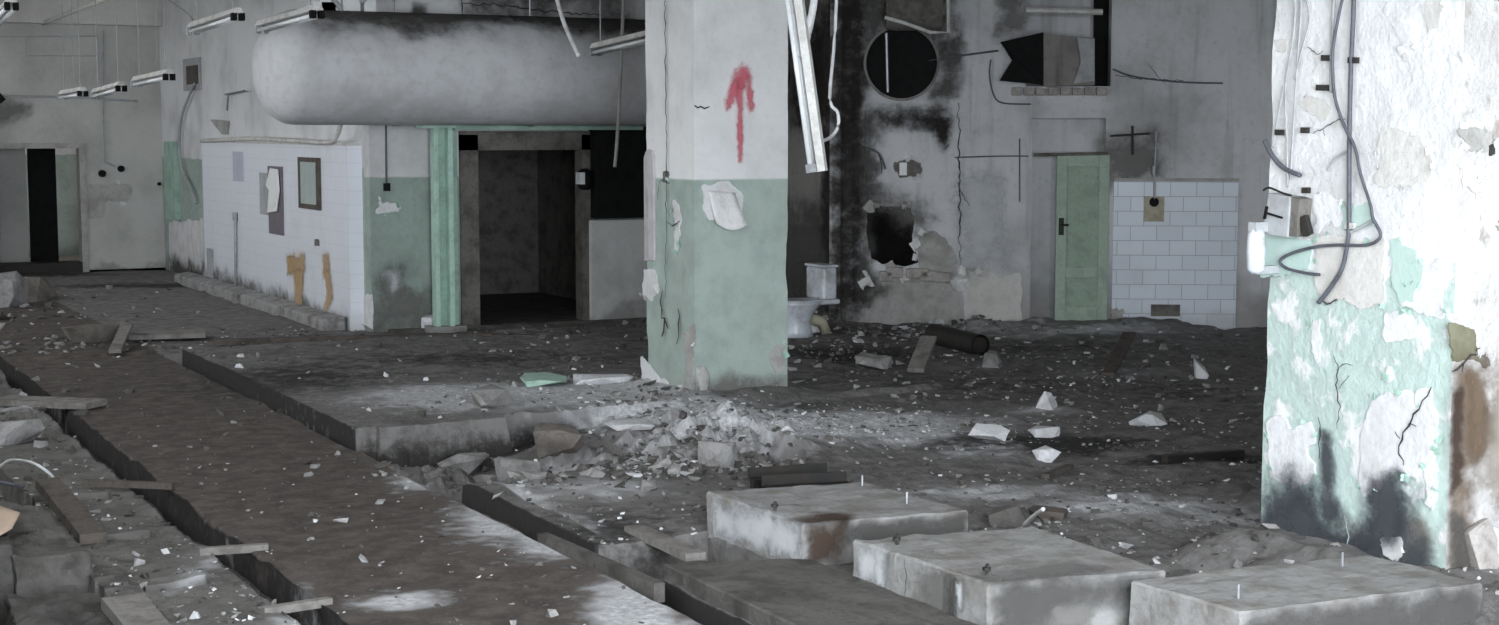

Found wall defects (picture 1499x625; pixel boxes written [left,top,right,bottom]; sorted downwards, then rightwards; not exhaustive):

water stain [820,0,863,294]
spalling [893,153,923,183]
water stain [936,119,947,148]
spalling [857,199,1023,324]
peeling [1292,188,1447,343]
peeling [1264,415,1320,485]
water stain [1262,430,1430,566]
water stain [1250,589,1482,625]
peeling [1381,537,1405,561]
peeling [1358,366,1443,511]
crack [1395,348,1480,466]
water stain [1450,367,1499,569]